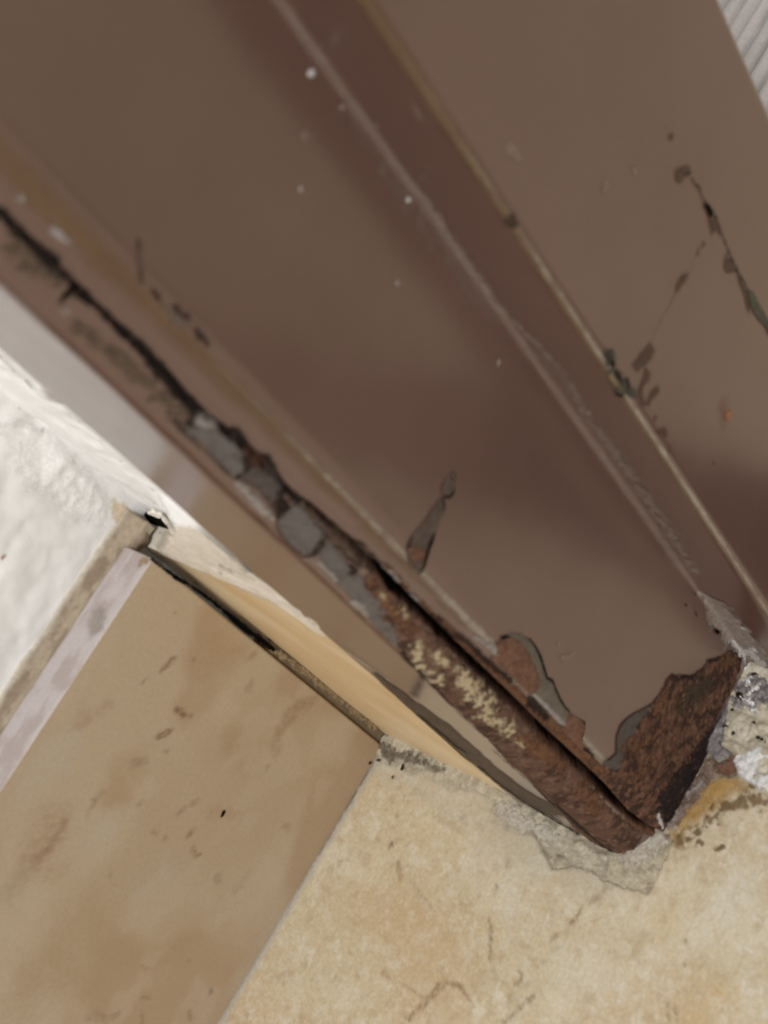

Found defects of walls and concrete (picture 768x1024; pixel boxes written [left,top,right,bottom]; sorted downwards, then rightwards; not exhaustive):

crack [0,208,343,531]
peeling [0,282,402,657]
peeling [372,471,608,762]
crack [372,558,640,820]
corrosion [274,489,768,854]
peeling [534,254,768,613]
peeling [705,203,721,235]